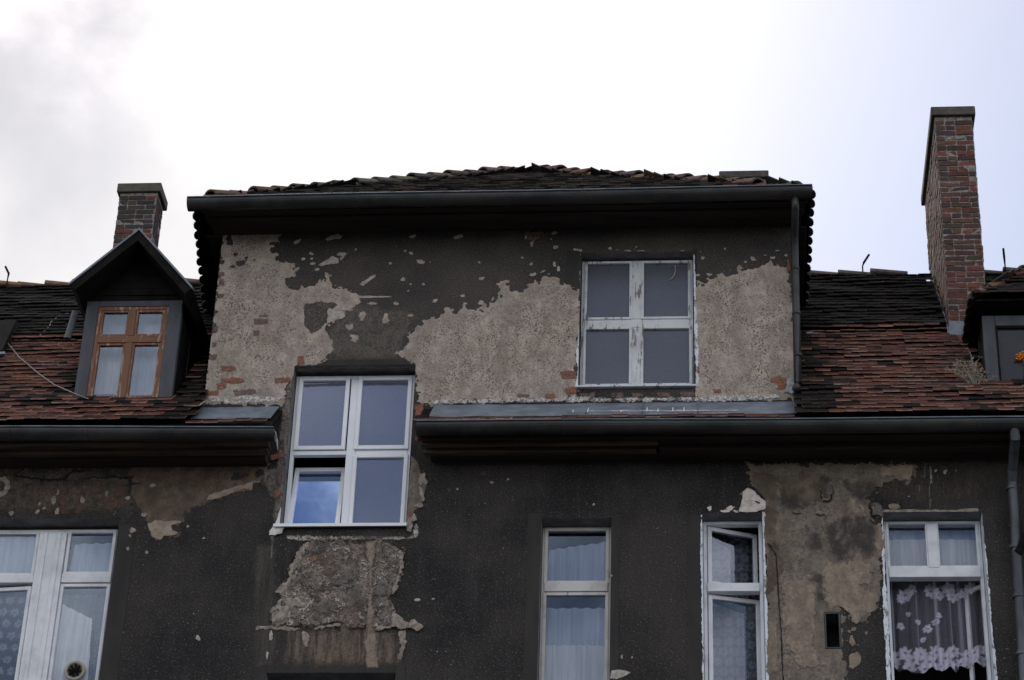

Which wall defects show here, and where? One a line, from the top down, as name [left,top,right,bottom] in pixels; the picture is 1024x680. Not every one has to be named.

peeling [126,230,595,550]
peeling [657,250,794,402]
spalling [256,538,423,659]
peeling [610,655,633,679]
peeling [740,460,998,680]